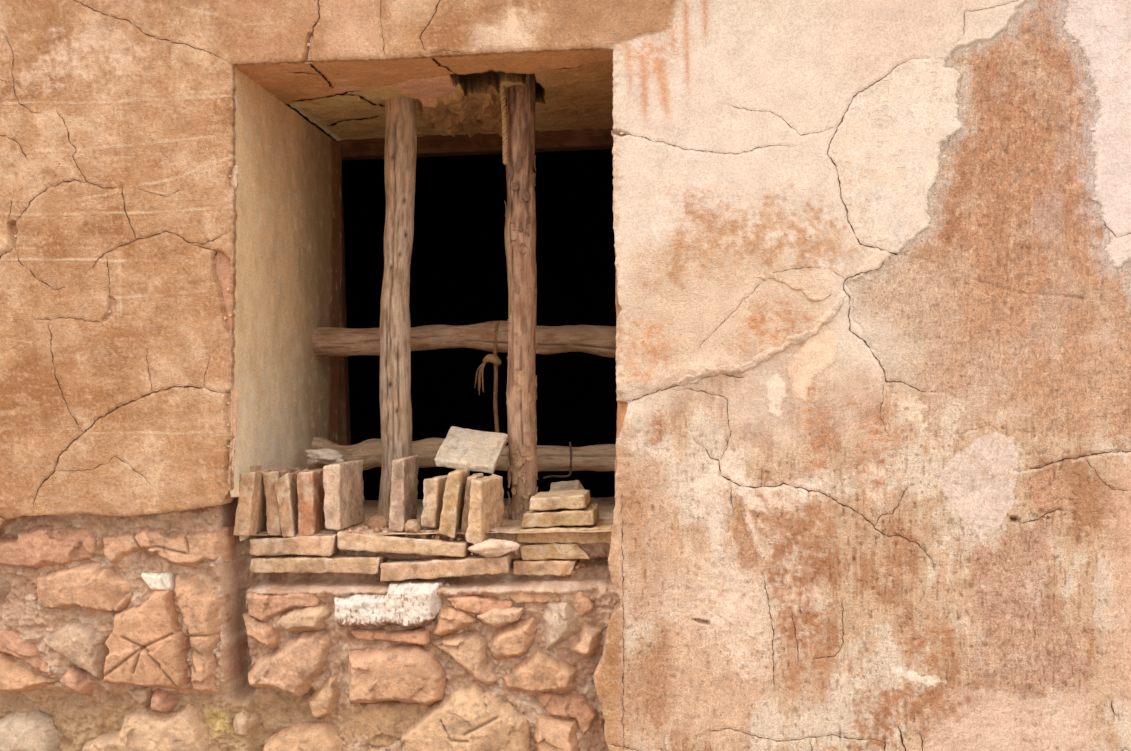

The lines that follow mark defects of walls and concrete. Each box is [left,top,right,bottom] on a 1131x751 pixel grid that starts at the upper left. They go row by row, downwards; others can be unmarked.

crack [74,0,229,63]
crack [288,0,385,126]
crack [420,0,461,73]
crack [0,36,231,294]
crack [630,58,937,432]
crack [33,317,216,512]
crack [625,375,934,566]
peeling [845,0,1131,700]
crack [1021,450,1131,491]
crack [610,491,638,751]
crack [763,575,844,680]
crack [699,726,923,751]